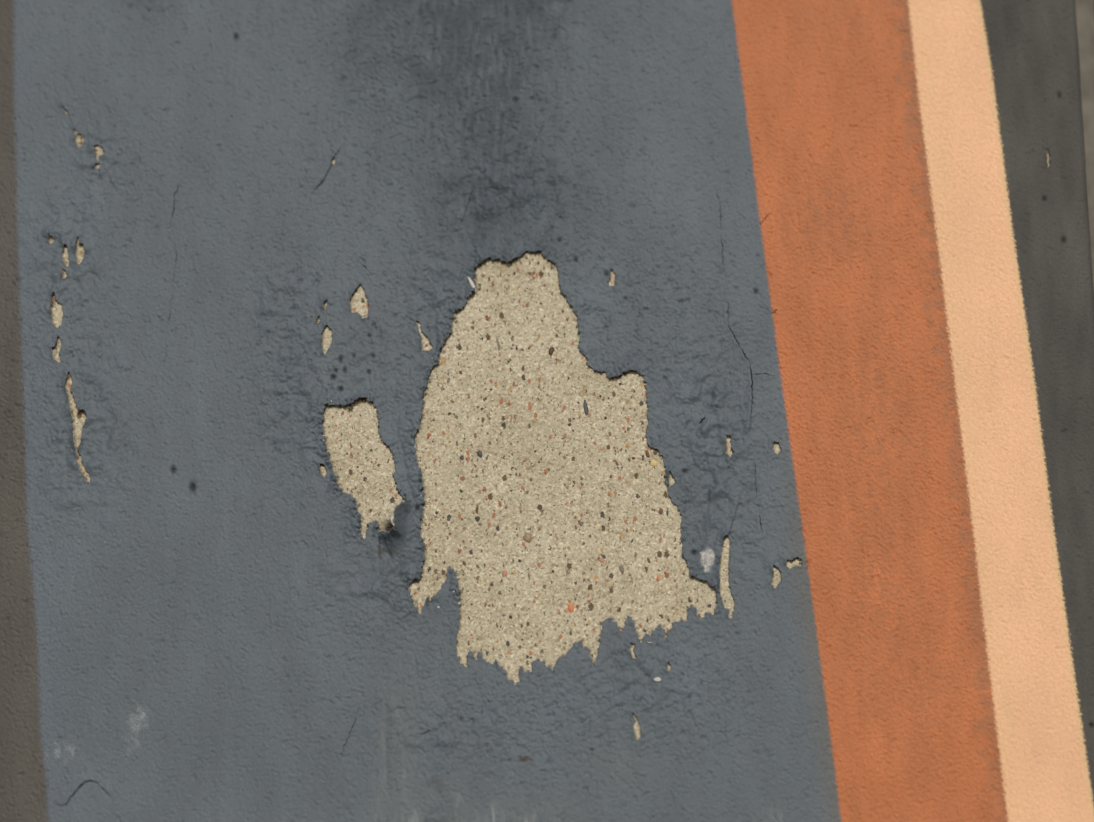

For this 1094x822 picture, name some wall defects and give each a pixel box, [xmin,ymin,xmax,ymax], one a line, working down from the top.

peeling [48,233,85,279]
peeling [49,292,91,483]
peeling [316,299,332,355]
peeling [319,250,735,685]
crack [715,187,772,429]